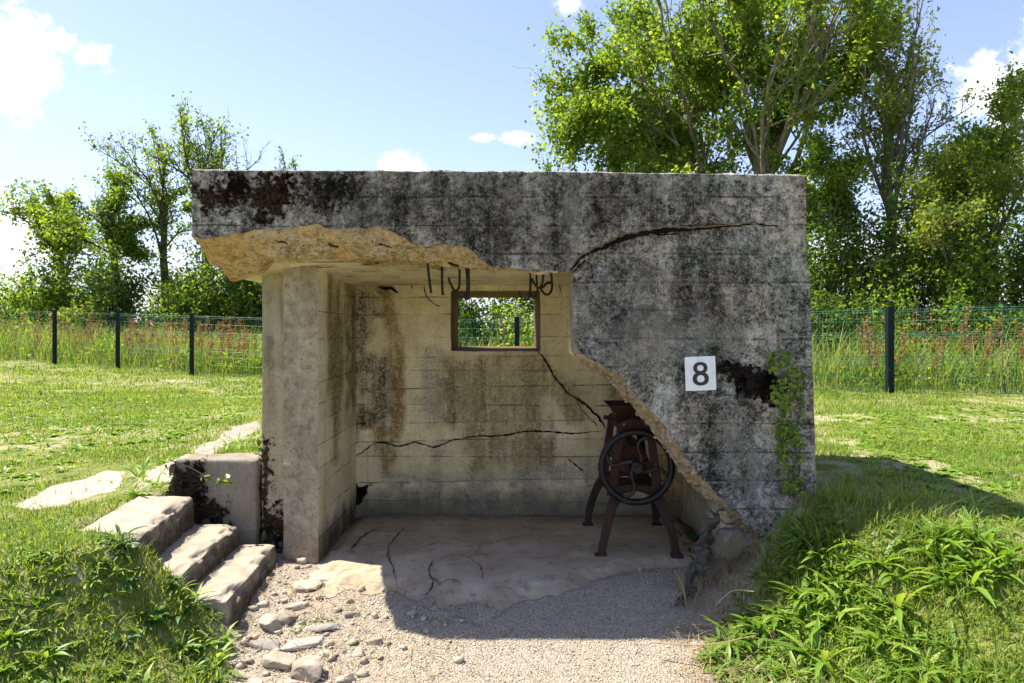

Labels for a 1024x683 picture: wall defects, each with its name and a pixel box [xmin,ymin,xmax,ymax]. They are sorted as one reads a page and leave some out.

crack [559,220,779,297]
water stain [328,278,396,460]
spalling [193,225,758,553]
crack [356,351,606,471]
crack [346,527,560,595]